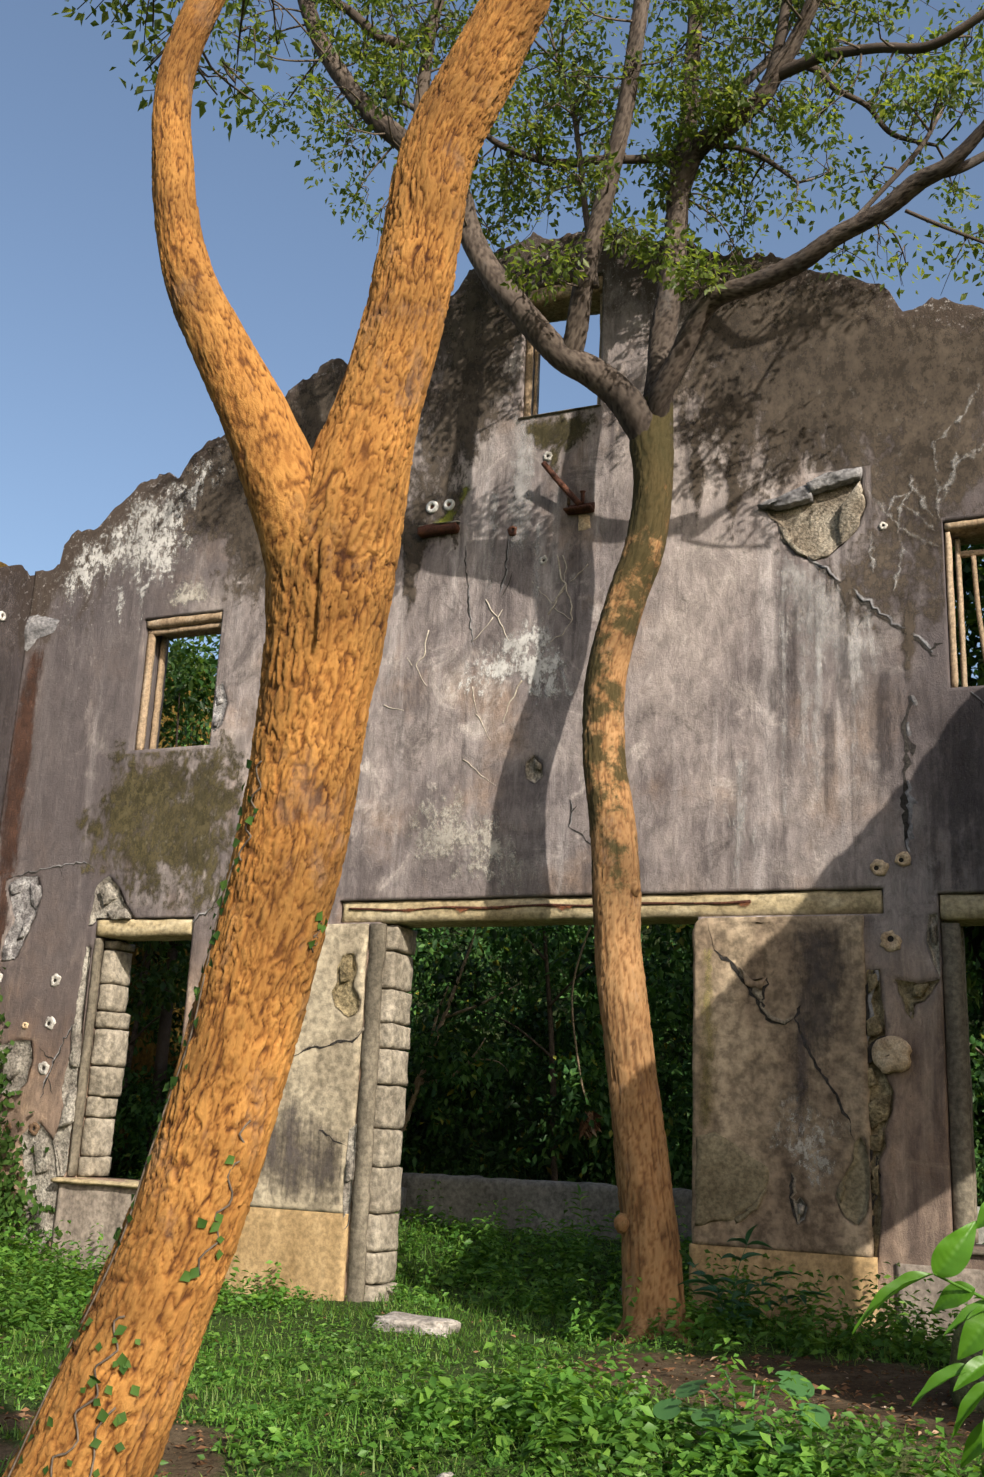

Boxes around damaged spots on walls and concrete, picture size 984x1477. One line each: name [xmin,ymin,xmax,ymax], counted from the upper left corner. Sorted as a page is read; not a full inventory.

damp [286,367,346,450]
damp [63,440,266,622]
damp [673,278,984,795]
efflorescence [459,619,571,697]
crack [900,695,918,853]
peeling [2,876,42,961]
crack [714,949,881,1227]